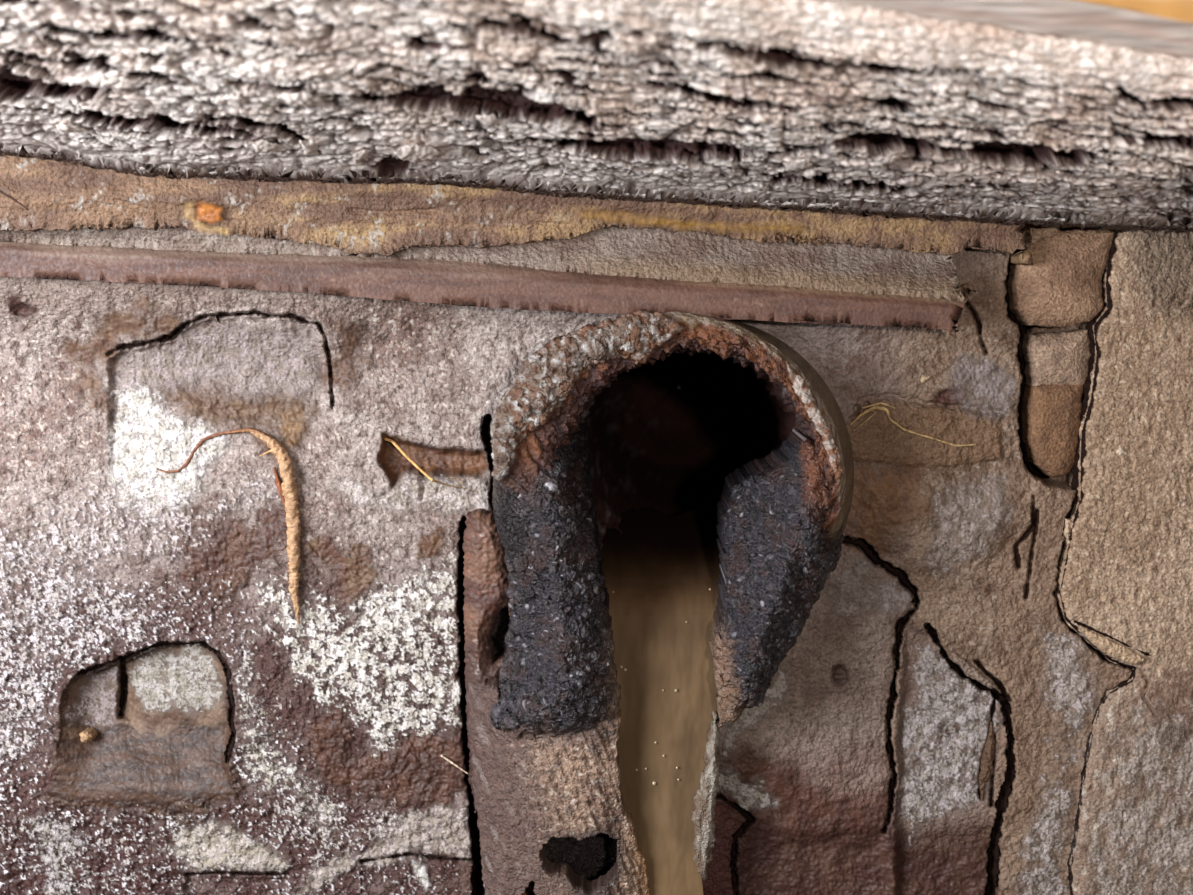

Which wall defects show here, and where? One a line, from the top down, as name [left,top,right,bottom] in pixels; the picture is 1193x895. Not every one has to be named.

corrosion [184,203,230,235]
corrosion [67,299,180,411]
crack [108,311,333,408]
corrosion [319,319,366,390]
corrosion [0,242,976,335]
crack [966,301,987,353]
leakage [0,325,491,895]
crack [1006,231,1158,895]
crack [842,537,1015,895]